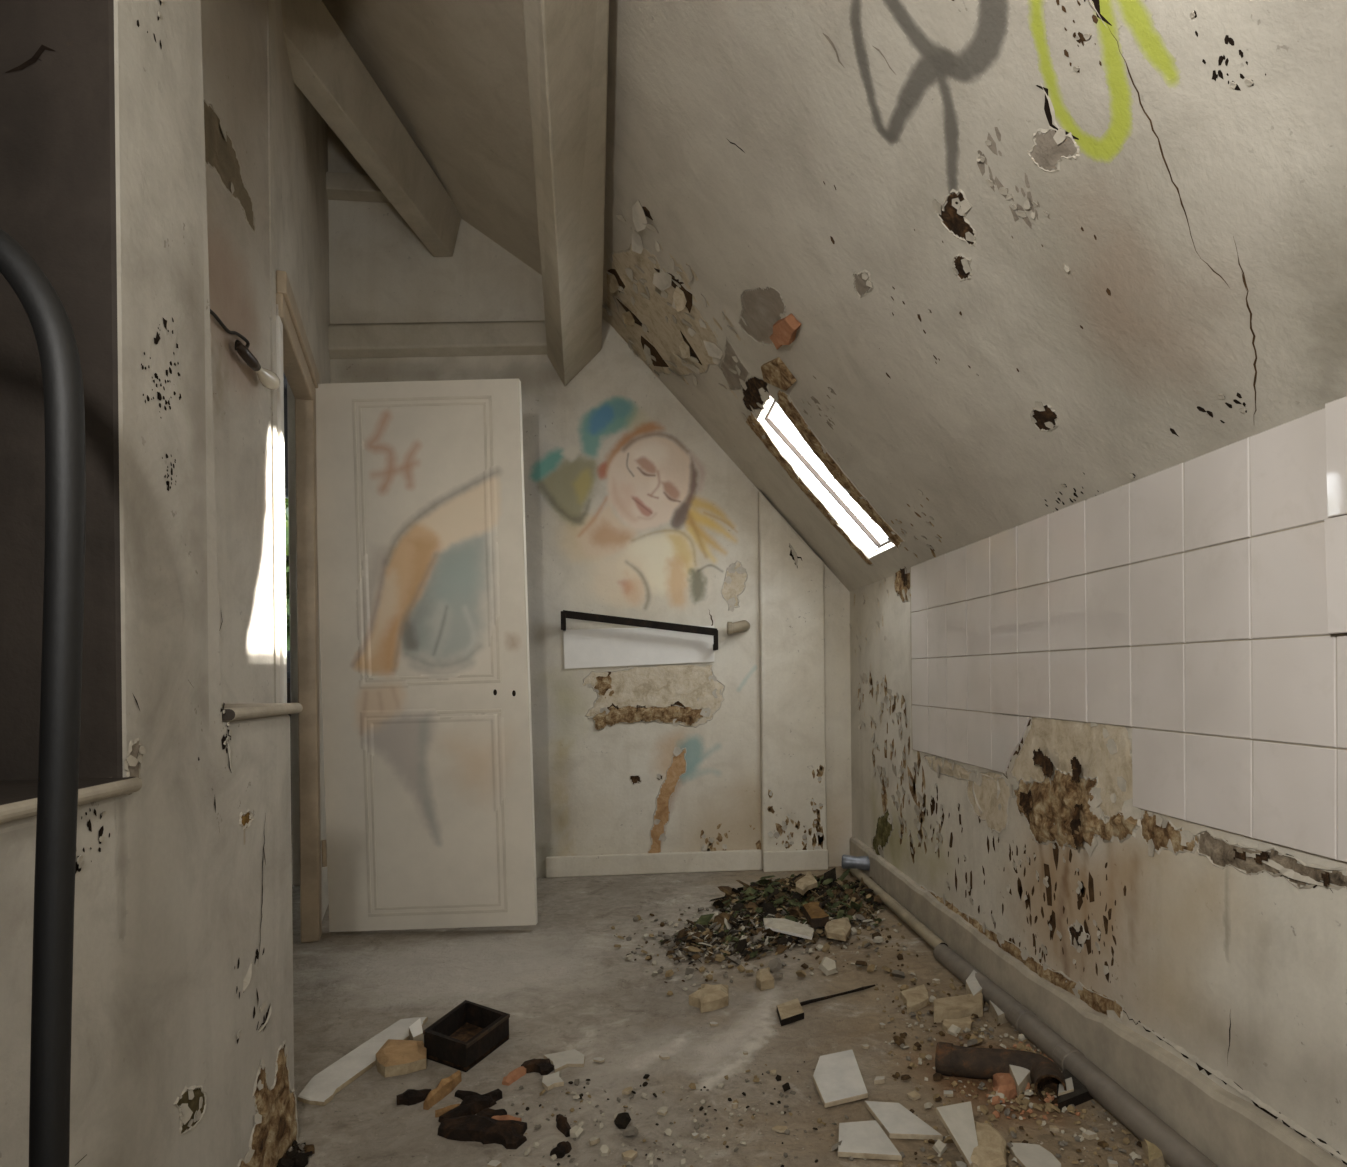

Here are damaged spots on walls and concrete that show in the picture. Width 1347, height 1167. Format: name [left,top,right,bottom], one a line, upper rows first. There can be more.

spalling [204,99,255,233]
crack [1036,82,1079,140]
crack [1084,0,1257,414]
spalling [582,189,1347,1025]
spalling [174,1084,207,1136]
spalling [237,1040,298,1167]